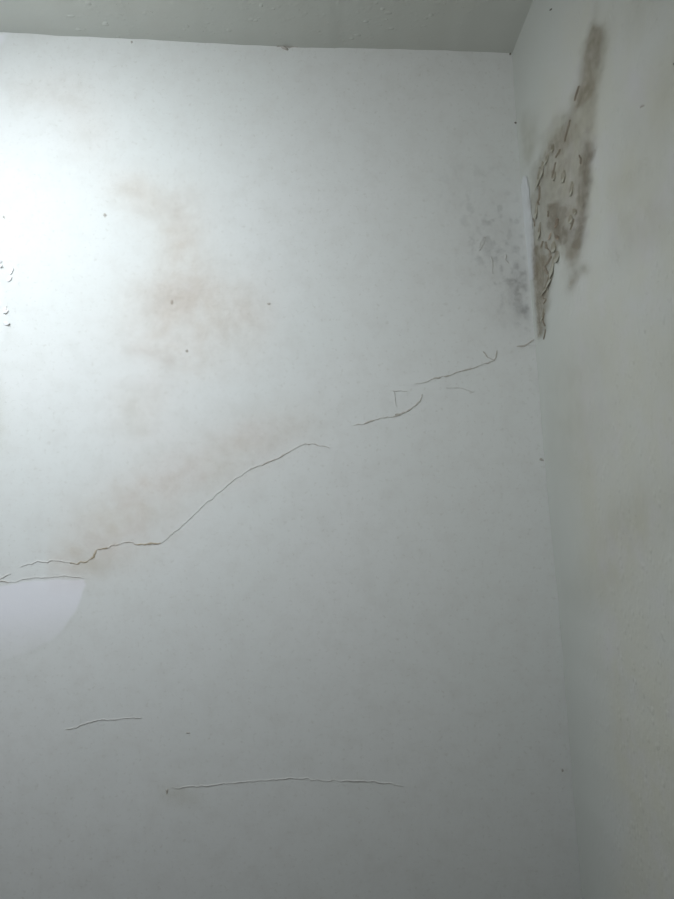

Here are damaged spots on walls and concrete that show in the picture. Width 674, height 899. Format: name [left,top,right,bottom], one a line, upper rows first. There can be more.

crack [356,339,536,425]
crack [0,443,329,583]